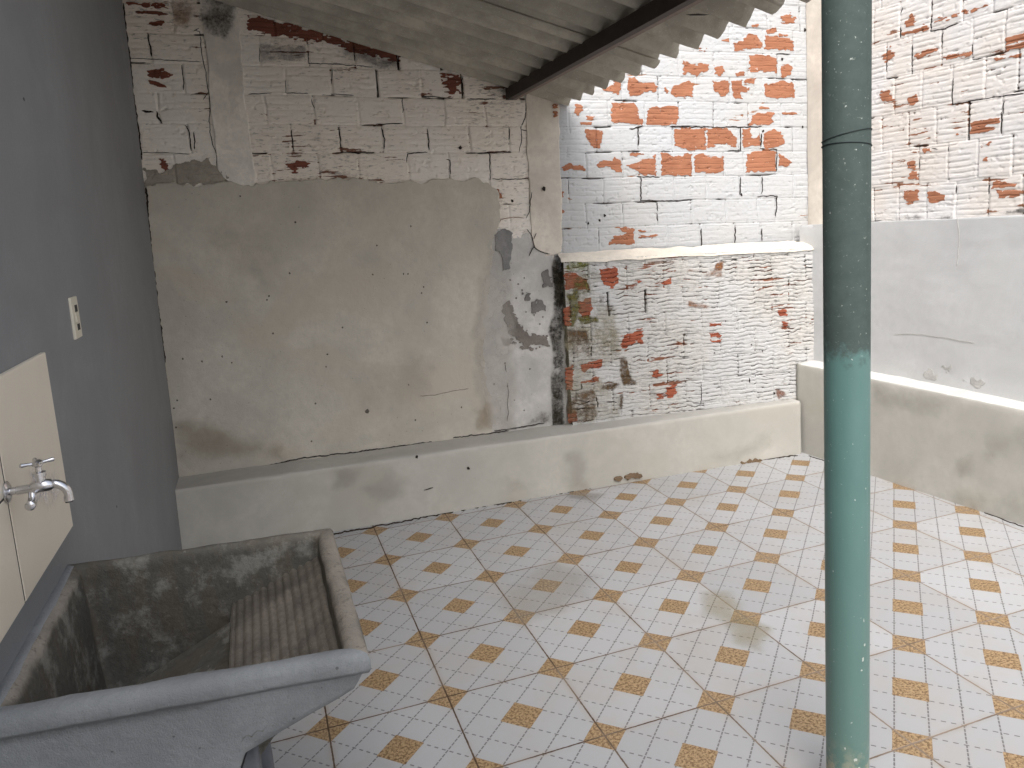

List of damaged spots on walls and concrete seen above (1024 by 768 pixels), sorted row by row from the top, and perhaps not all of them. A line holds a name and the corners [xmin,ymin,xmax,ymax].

peeling [901,4,988,39]
peeling [914,48,973,60]
peeling [994,33,1024,61]
peeling [562,12,806,176]
peeling [879,90,919,106]
peeling [956,118,1000,161]
peeling [902,148,945,205]
peeling [991,180,1021,198]
crack [493,178,548,256]
peeling [609,226,658,245]
spalling [495,229,619,351]
leakage [542,256,623,425]